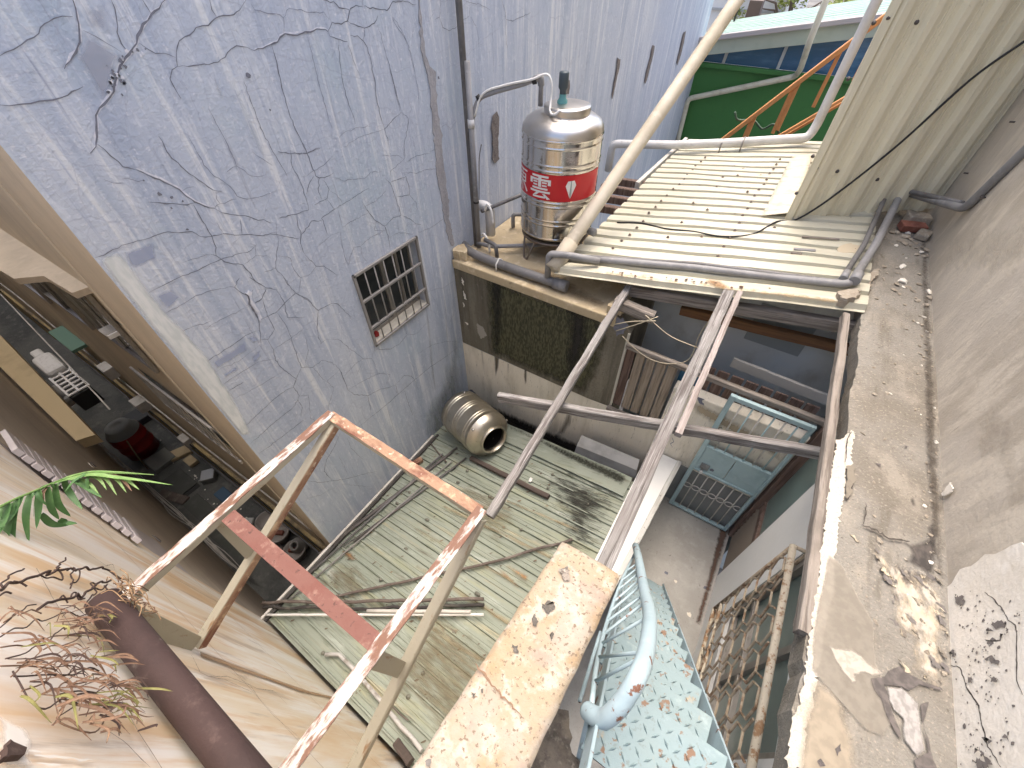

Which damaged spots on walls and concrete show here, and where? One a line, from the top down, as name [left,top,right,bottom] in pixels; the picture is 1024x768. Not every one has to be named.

crack [0,0,458,496]
damp [567,285,597,303]
spalling [845,465,856,499]
rust [201,652,332,698]
spalling [532,600,555,627]
peeling [831,542,1024,768]
crack [951,665,1001,767]
crack [985,592,1023,695]